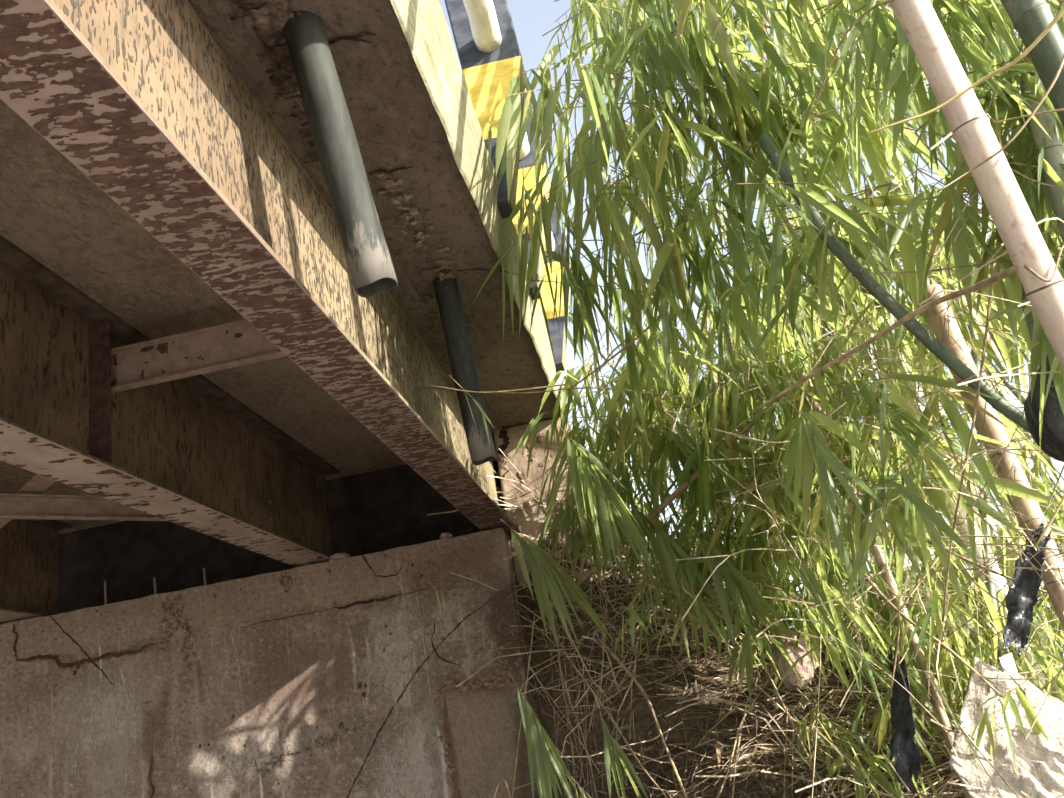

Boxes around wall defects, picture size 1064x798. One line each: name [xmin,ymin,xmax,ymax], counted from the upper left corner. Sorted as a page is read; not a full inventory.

peeling [0,0,513,530]
corrosion [140,341,175,379]
peeling [0,423,331,593]
crack [243,548,428,628]
crack [12,615,159,798]
crack [346,597,496,798]